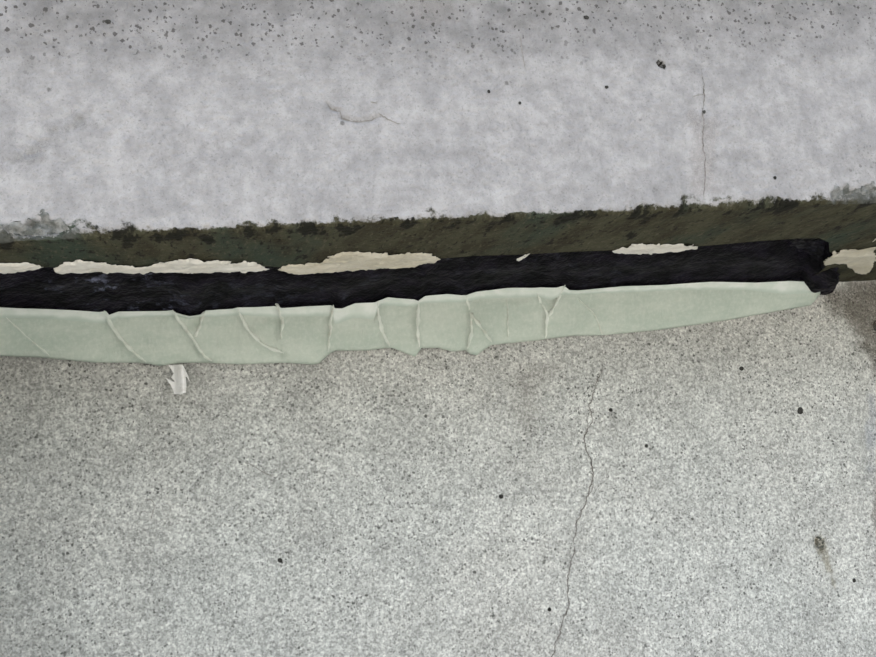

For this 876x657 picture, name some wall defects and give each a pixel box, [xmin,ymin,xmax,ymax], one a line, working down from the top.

spalling [0,209,80,238]
crack [551,355,604,657]